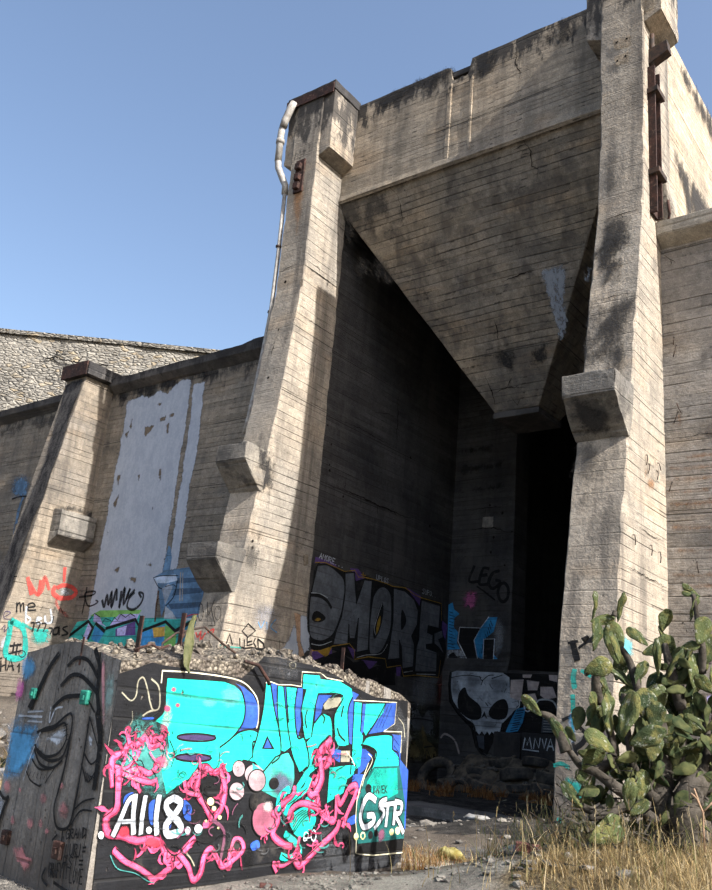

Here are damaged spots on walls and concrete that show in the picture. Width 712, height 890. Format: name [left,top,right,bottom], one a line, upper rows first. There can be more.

leakage [545,19,570,42]
leakage [378,68,455,107]
leakage [476,51,496,77]
leakage [594,217,629,283]
leakage [542,265,568,340]
peeling [88,379,205,620]